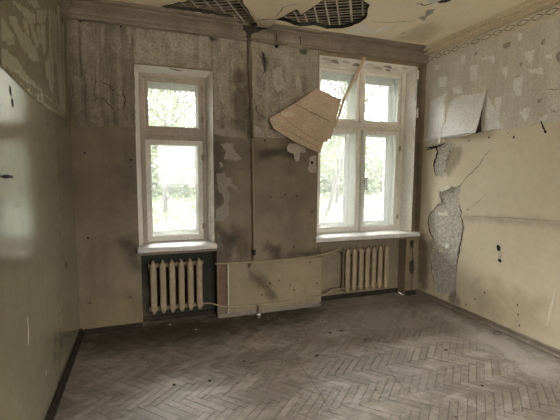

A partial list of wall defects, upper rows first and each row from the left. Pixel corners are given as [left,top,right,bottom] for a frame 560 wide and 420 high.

spalling [161,0,257,26]
spalling [276,0,370,29]
peeling [287,143,317,173]
peeling [215,143,242,221]
spalling [427,185,464,302]